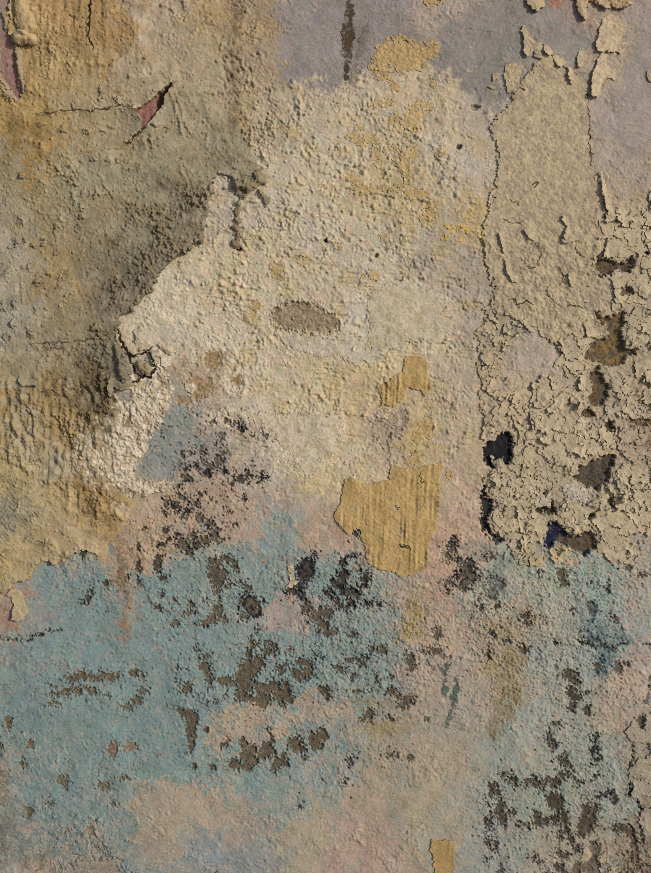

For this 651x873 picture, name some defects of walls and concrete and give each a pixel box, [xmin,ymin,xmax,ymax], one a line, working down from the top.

crack [38,104,133,114]
peeling [443,0,651,611]
crack [32,337,94,351]
crack [117,329,157,390]
peeling [0,0,417,725]
peeling [405,626,447,675]
peeling [487,628,540,655]
peeling [592,655,629,674]
peeling [556,668,591,720]
peeling [176,706,209,769]
peeling [220,726,328,773]
peeling [483,713,651,873]